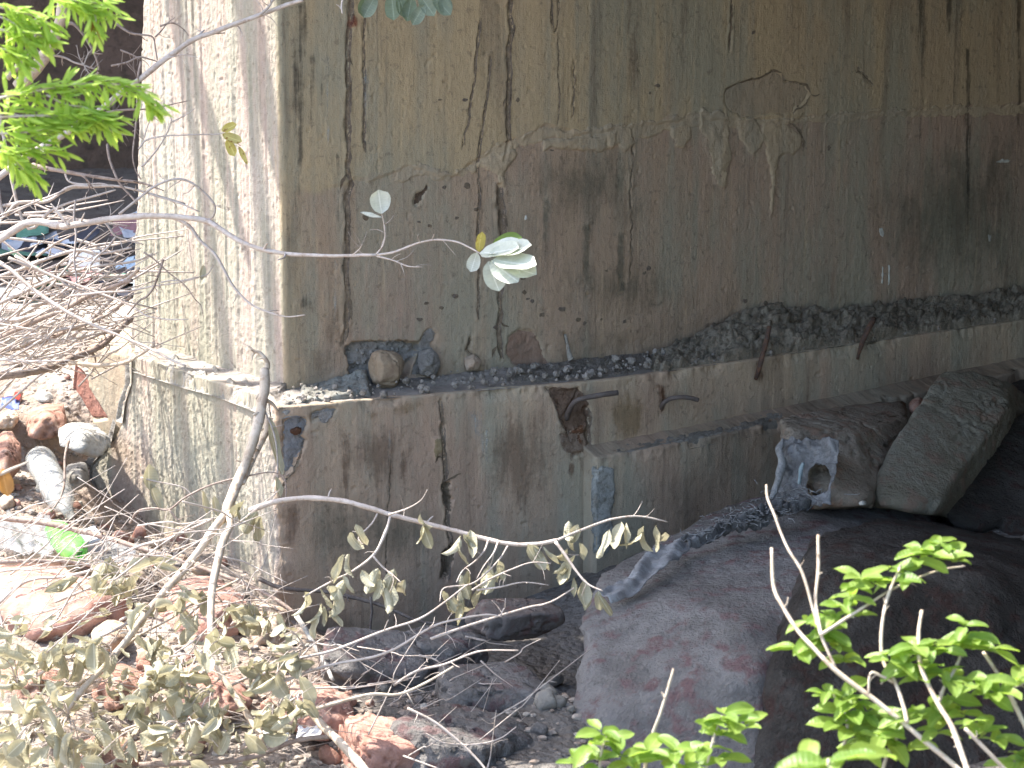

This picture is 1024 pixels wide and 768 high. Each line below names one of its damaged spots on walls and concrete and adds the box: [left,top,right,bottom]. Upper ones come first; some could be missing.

crack [340,0,367,344]
crack [462,0,515,359]
peeling [762,118,805,214]
spalling [73,318,548,488]
crack [435,401,461,581]